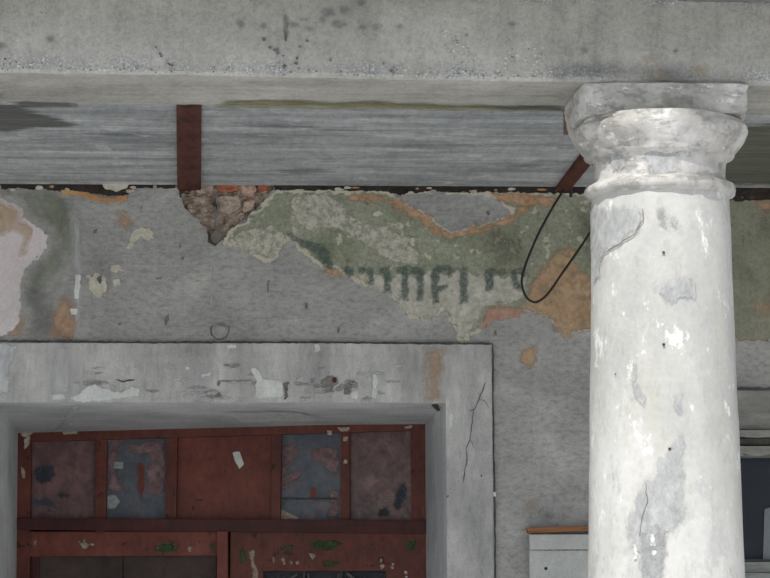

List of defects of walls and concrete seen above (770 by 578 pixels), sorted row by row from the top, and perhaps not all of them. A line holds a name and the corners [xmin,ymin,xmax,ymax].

damp [0,101,73,132]
peeling [0,184,644,343]
peeling [729,188,770,344]
spalling [52,371,149,403]
spalling [182,368,383,403]
crack [0,340,496,578]
peeling [628,436,686,578]